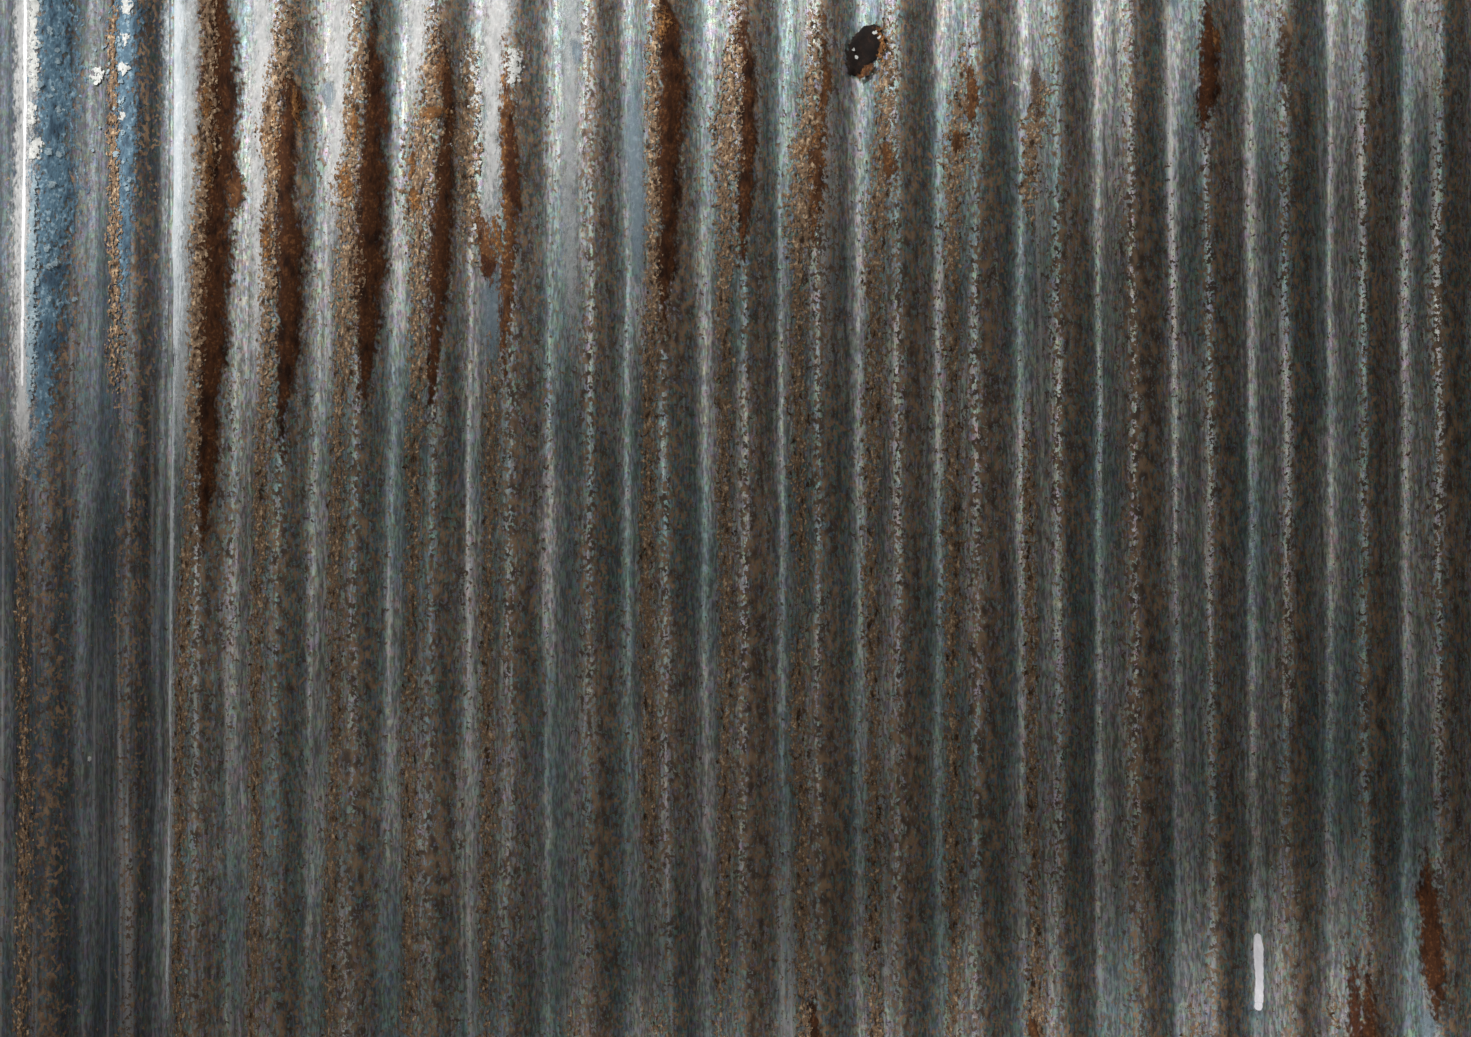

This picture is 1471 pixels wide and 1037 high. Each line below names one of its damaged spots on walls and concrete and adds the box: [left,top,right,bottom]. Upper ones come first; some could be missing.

rust [1414,846,1447,1021]